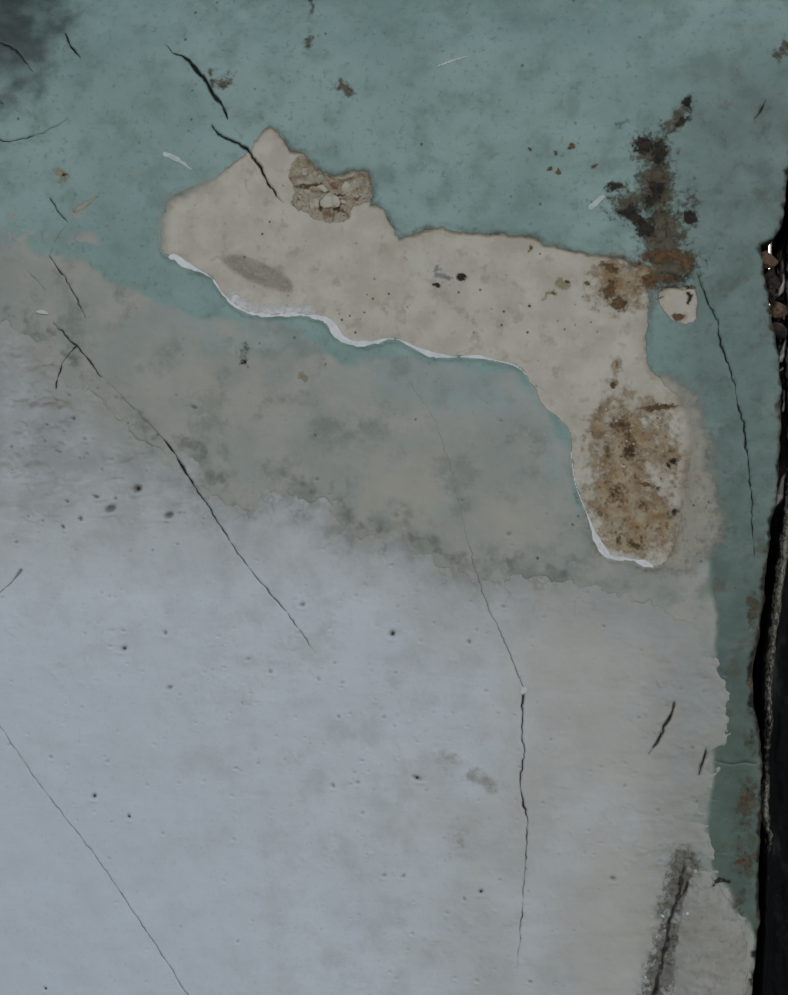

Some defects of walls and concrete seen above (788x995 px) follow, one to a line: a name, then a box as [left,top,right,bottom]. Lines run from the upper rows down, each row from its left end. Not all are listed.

crack [30,198,86,318]
crack [56,325,309,644]
crack [168,47,281,201]
peeling [161,127,724,573]
corrosion [582,360,689,555]
corrosion [584,96,707,325]
crack [698,276,755,554]
crack [0,726,188,995]
crack [403,373,528,966]
crack [649,703,675,753]